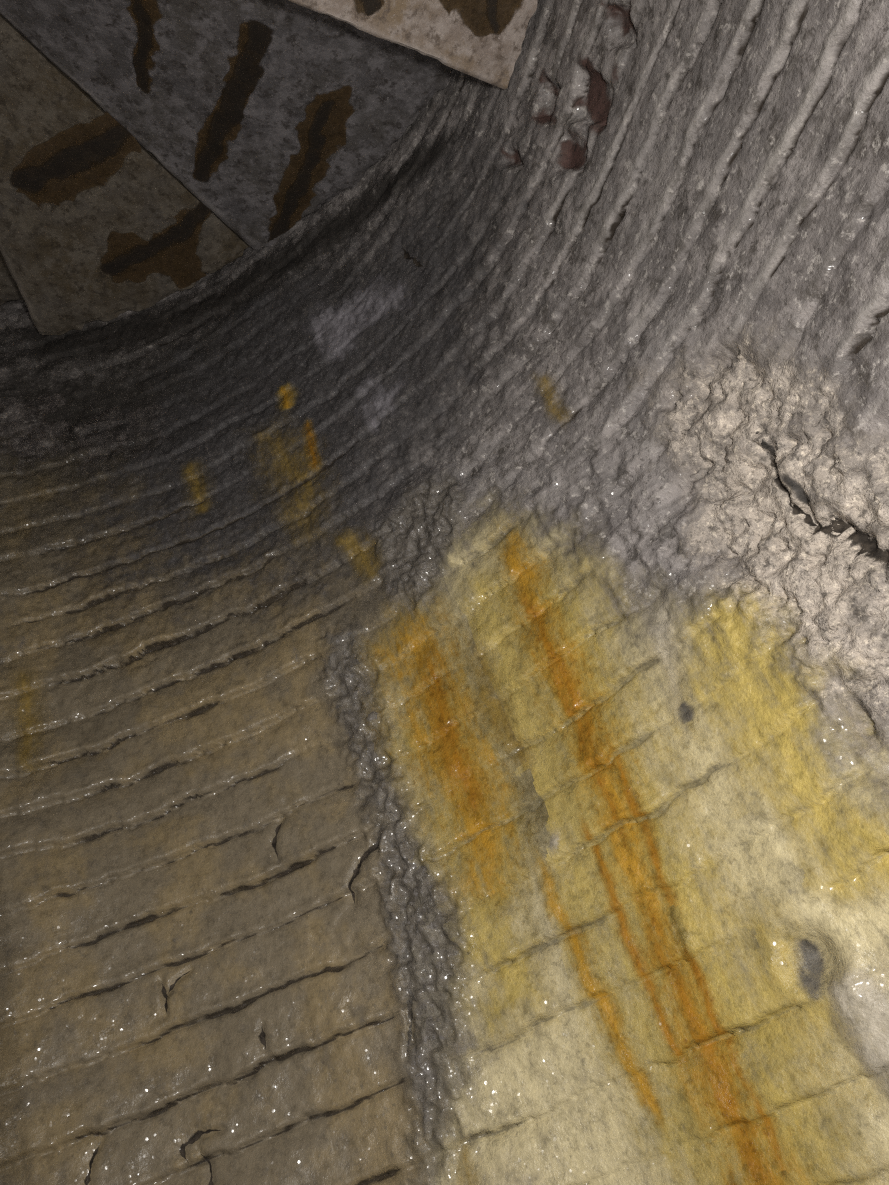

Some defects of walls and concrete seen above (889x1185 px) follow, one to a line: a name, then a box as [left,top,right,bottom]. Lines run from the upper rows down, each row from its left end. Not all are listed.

crack [769,453,889,583]
corrosion [375,614,528,898]
corrosion [500,531,825,1185]